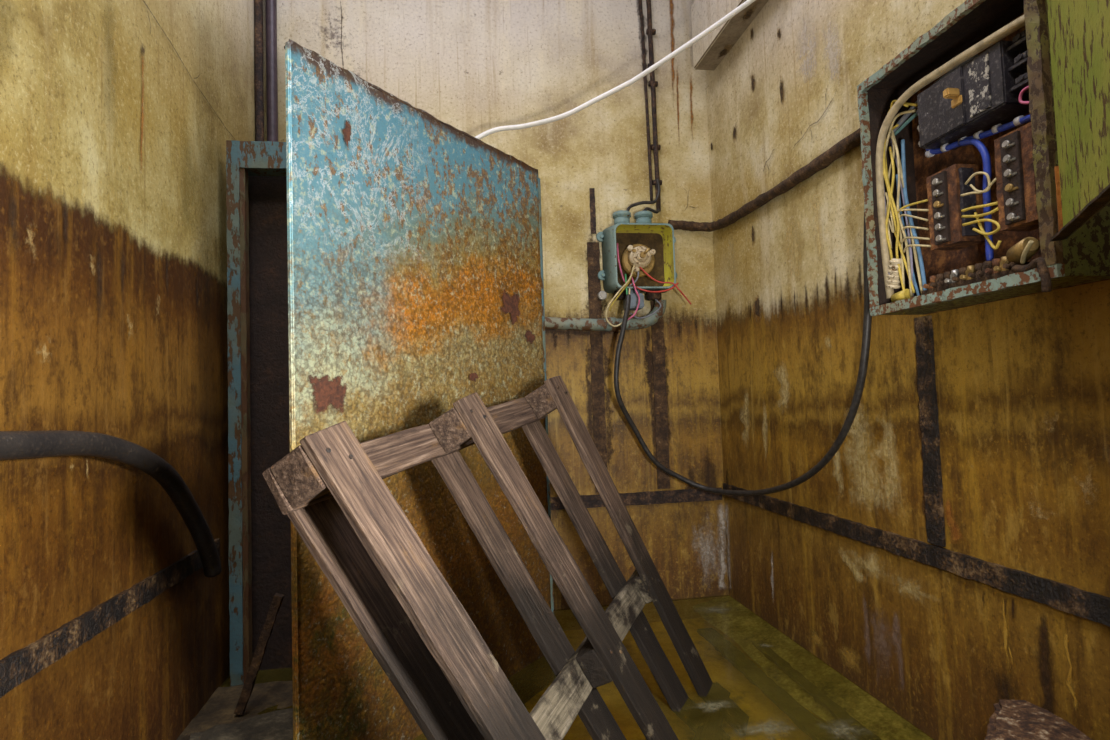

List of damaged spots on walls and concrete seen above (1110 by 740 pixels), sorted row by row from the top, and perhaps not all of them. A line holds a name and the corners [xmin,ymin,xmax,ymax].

rust [669,0,693,130]
rust [545,329,624,463]
rust [644,329,671,459]
damp [545,266,1110,740]